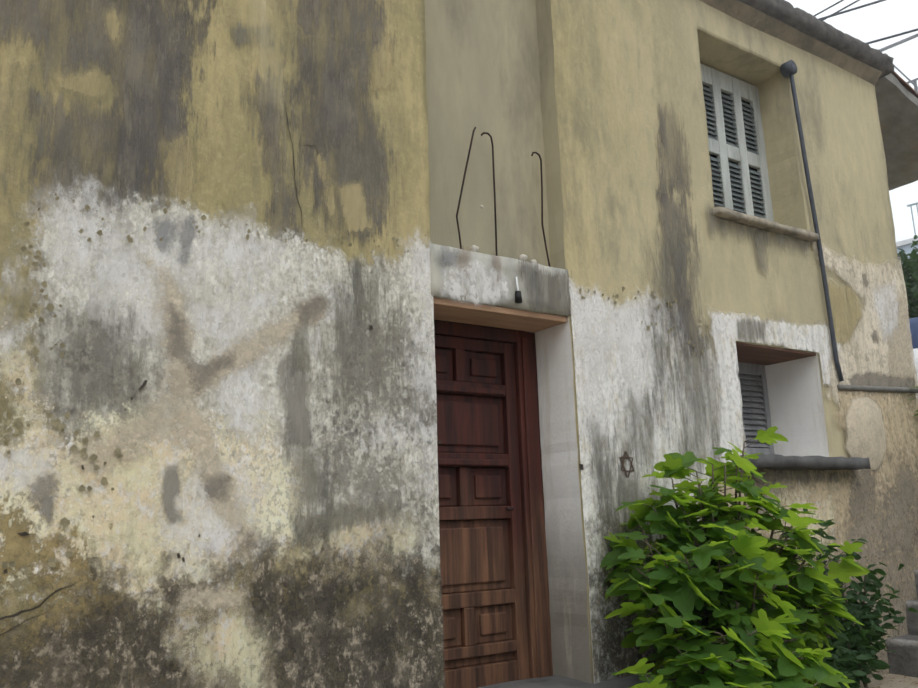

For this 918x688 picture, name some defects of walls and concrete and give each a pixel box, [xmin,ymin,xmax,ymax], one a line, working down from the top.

leakage [0,0,214,220]
leakage [248,0,394,241]
leakage [157,218,194,263]
peeling [444,261,509,303]
leakage [654,105,719,455]
peeling [0,182,442,688]
leakage [592,428,659,522]
peeling [569,241,918,684]
leakage [48,582,199,688]
leakage [250,548,445,688]